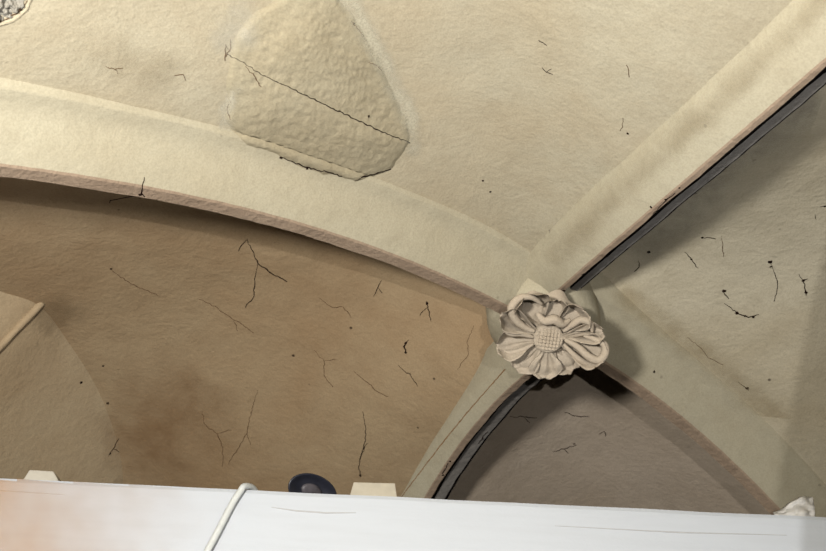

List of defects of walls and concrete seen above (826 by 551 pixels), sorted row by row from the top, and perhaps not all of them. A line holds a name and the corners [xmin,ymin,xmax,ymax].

hole [0,0,33,26]
crack [199,240,287,333]
crack [722,289,759,318]
crack [202,394,257,467]
crack [358,411,368,477]
crack [401,369,505,497]